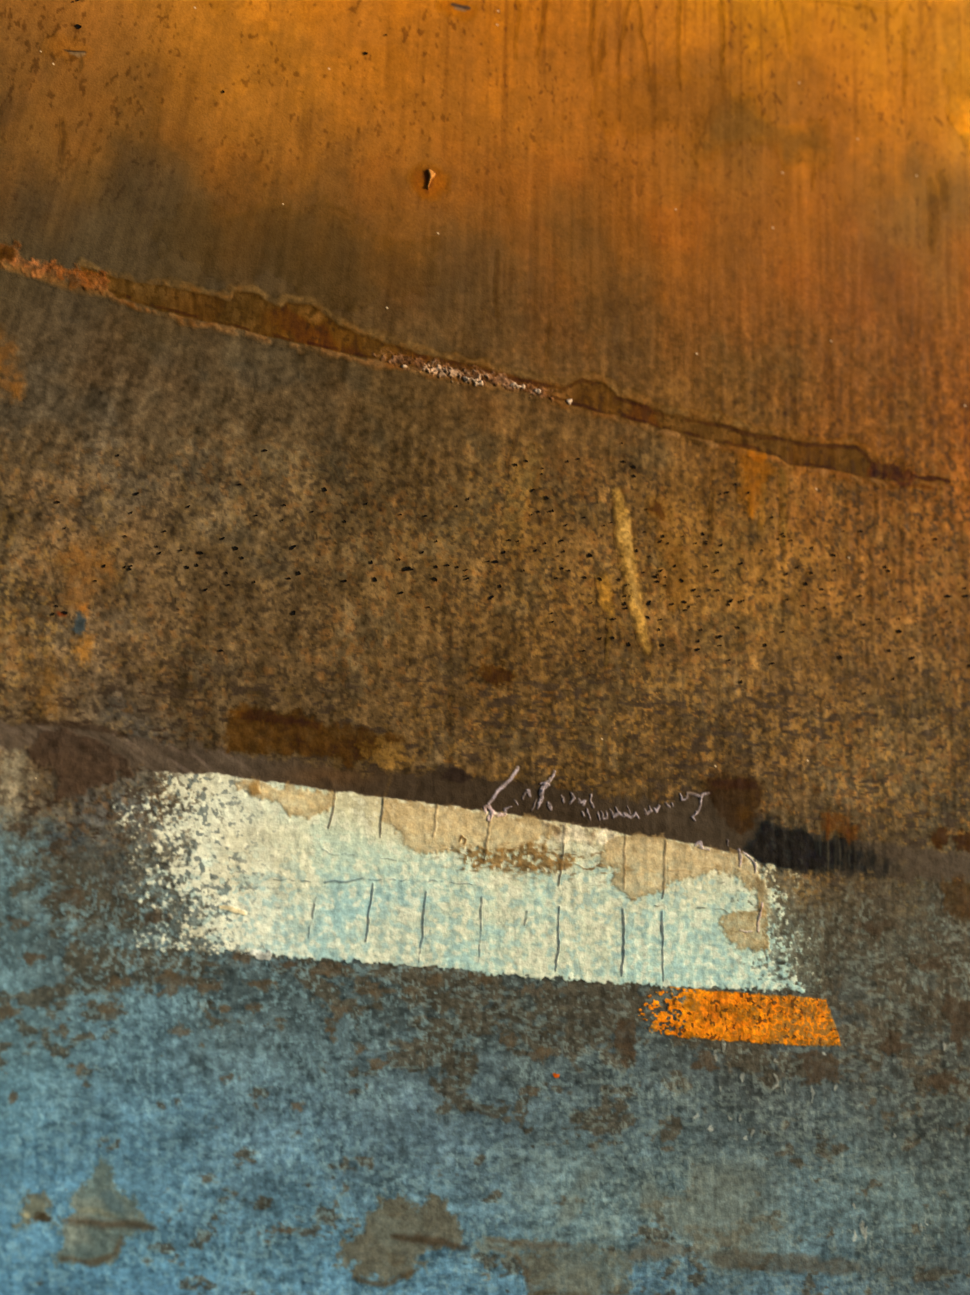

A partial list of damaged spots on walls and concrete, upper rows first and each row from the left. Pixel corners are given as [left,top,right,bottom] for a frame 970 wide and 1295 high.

rust [943,51,970,157]
crack [0,238,970,491]
peeling [141,906,173,928]
peeling [421,967,552,1000]
peeling [11,1153,163,1270]
peeling [329,1188,636,1295]